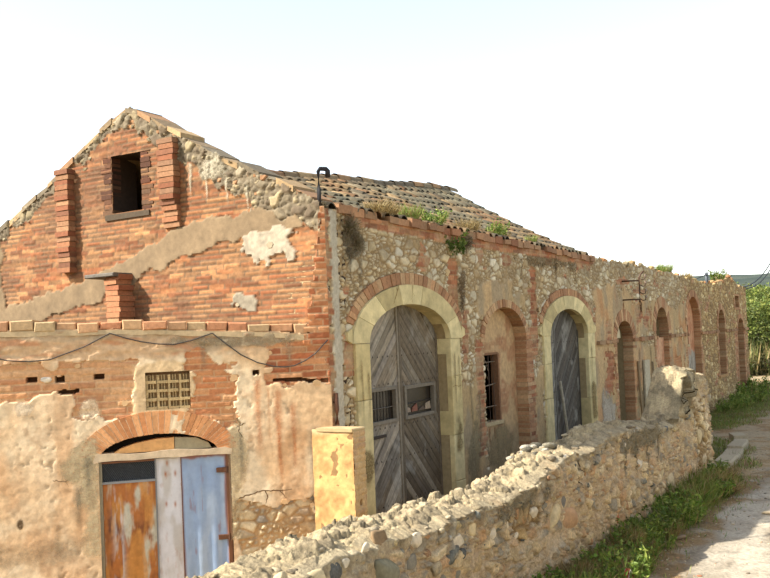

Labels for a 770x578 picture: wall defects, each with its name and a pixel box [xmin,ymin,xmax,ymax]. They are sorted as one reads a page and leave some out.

peeling [240,224,299,266]
peeling [0,358,140,420]
peeling [183,346,241,427]